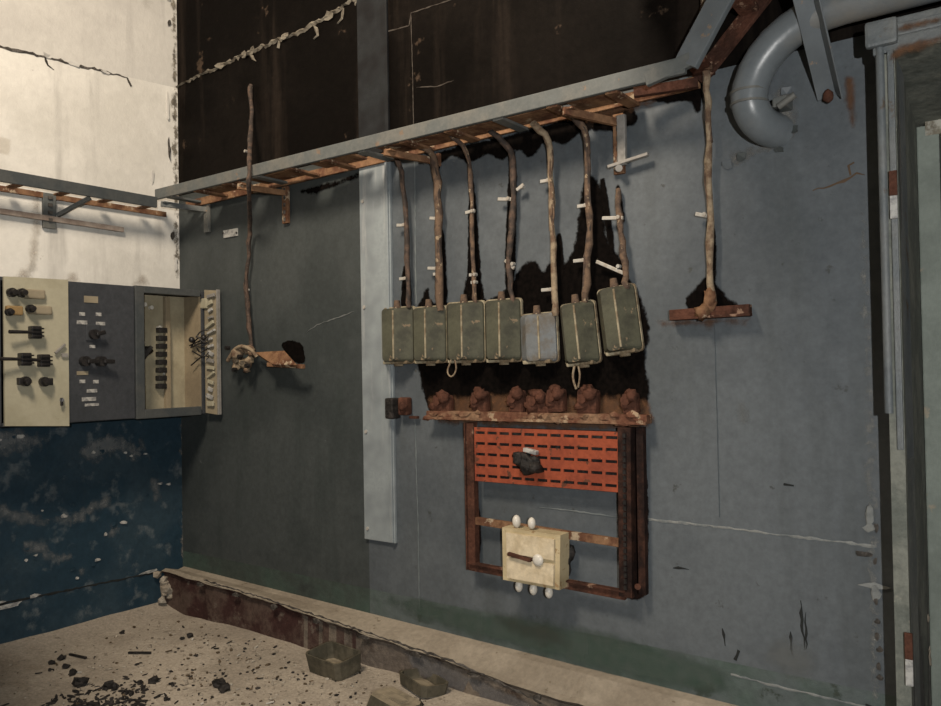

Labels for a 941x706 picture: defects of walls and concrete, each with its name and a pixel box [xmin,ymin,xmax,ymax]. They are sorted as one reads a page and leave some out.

corrosion [892,38,941,57]
crack [0,45,132,87]
spalling [282,340,305,364]
peeling [0,432,40,453]
peeling [82,436,157,459]
spalling [153,571,173,603]